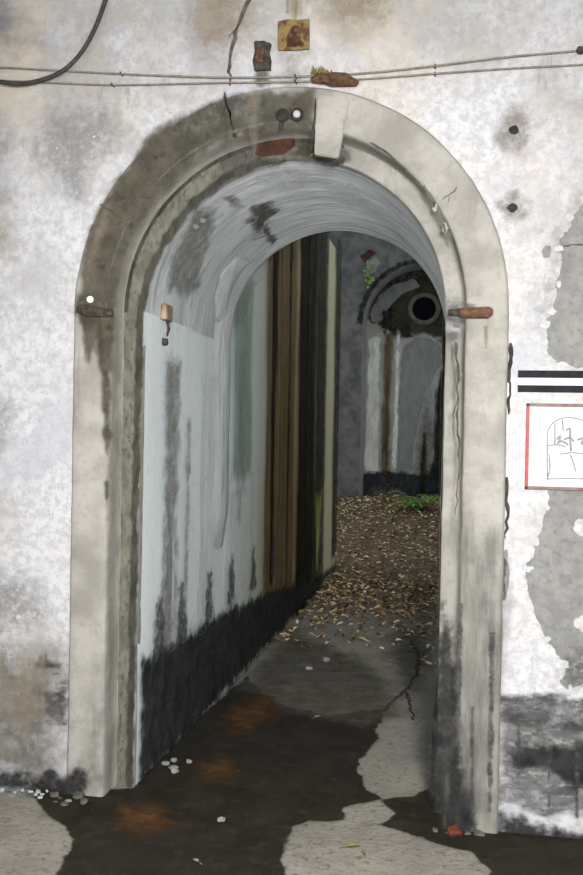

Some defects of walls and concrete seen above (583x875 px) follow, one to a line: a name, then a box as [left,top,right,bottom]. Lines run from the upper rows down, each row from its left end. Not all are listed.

crack [219,0,252,157]
spalling [539,196,583,371]
water stain [0,90,396,875]
water stain [357,259,446,527]
crack [384,641,421,720]
water stain [381,604,583,875]
spalling [522,490,583,691]